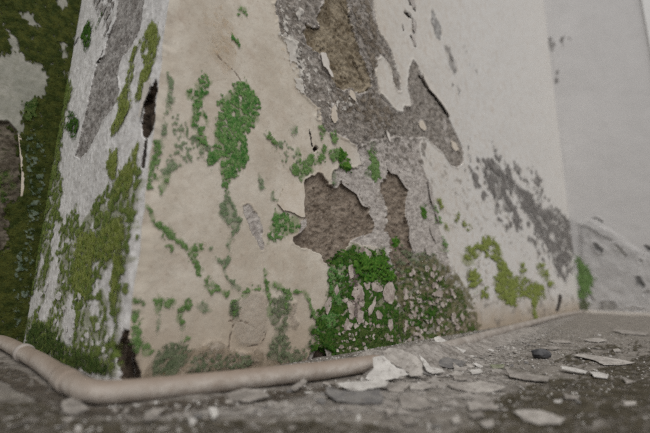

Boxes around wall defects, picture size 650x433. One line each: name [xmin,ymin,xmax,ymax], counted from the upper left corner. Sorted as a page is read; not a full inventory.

flaking render [0,121,24,250]
peeling [75,0,144,159]
crack [138,79,158,168]
peeling [275,0,464,343]
crack [418,71,450,118]
damp [465,141,575,286]